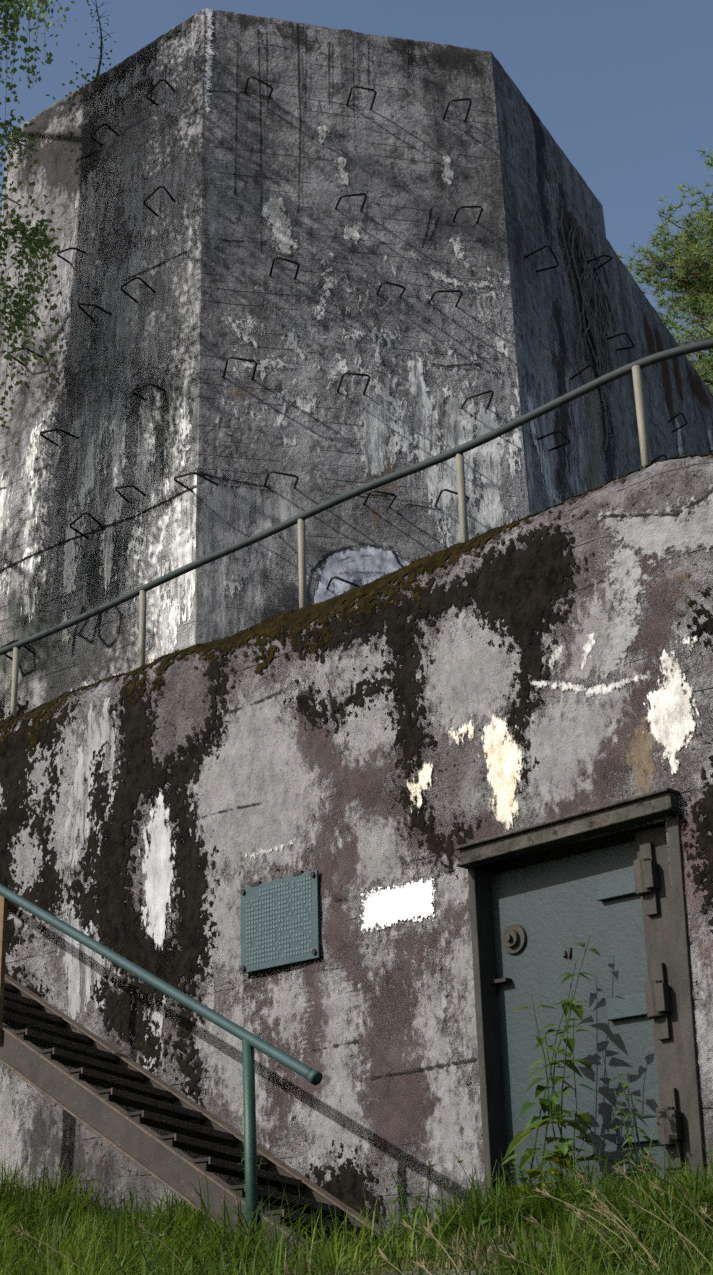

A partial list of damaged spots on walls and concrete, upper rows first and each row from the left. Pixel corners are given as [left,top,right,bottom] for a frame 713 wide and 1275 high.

damp [0,8,628,669]
rust [644,316,711,422]
crack [571,487,713,523]
spalling [541,484,713,681]
peeling [642,636,699,774]
peeling [407,763,433,812]
peeling [448,716,523,830]
damp [57,694,120,1020]
damp [139,790,178,951]
damp [680,809,708,935]
damp [134,995,174,1073]